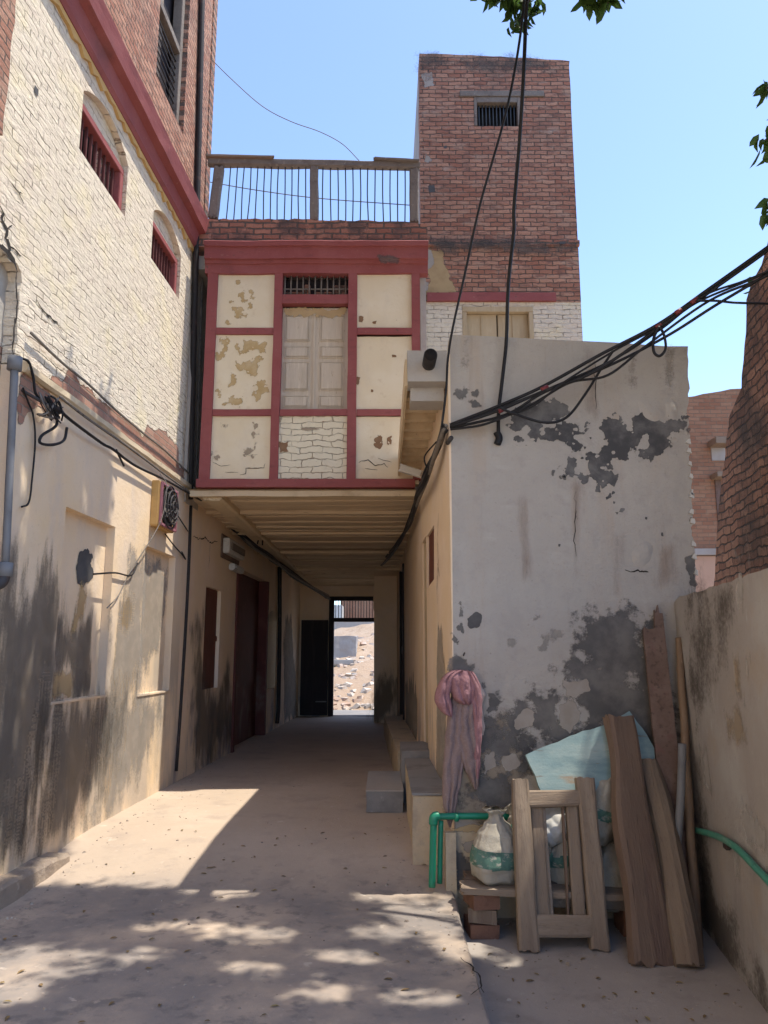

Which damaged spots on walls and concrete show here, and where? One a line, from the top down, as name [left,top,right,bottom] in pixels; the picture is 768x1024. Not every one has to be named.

peeling [215,279,269,408]
flaking render [17,368,184,479]
spalling [453,389,482,408]
spalling [505,397,695,524]
spalling [685,541,698,586]
damp [0,549,169,861]
peeling [514,708,535,730]
peeling [559,679,591,734]
peeling [484,751,520,774]